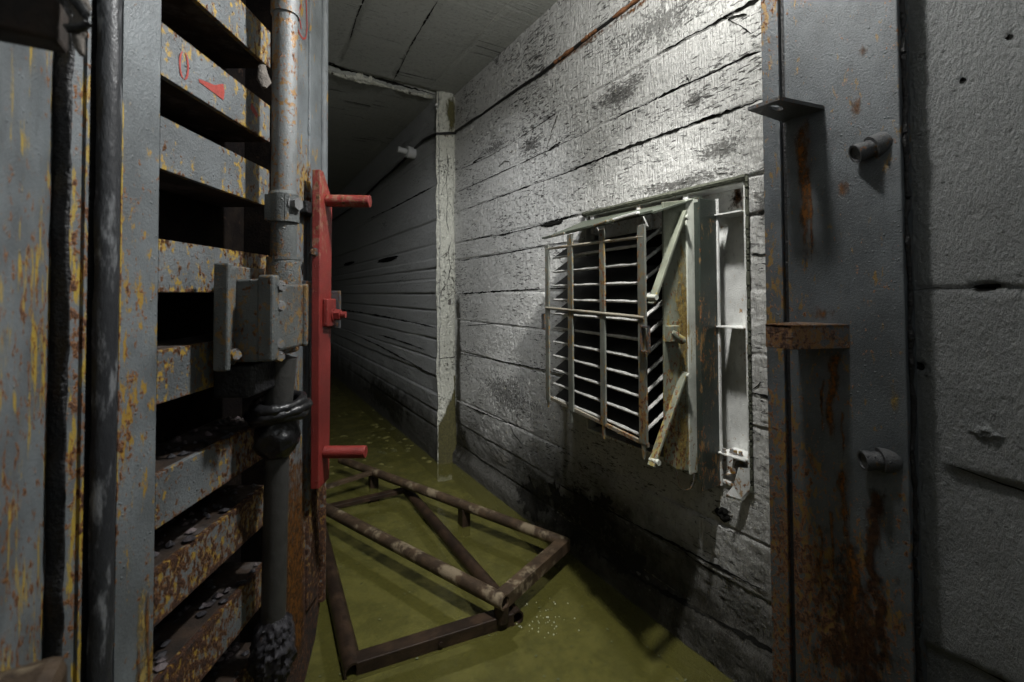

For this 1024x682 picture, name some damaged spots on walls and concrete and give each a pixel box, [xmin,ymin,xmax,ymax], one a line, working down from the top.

corrosion [553,28,604,68]
corrosion [613,0,645,19]
crack [615,0,761,119]
crack [372,99,762,297]
corrosion [795,121,813,260]
corrosion [675,232,689,459]
water stain [515,467,729,636]
corrosion [865,490,887,659]